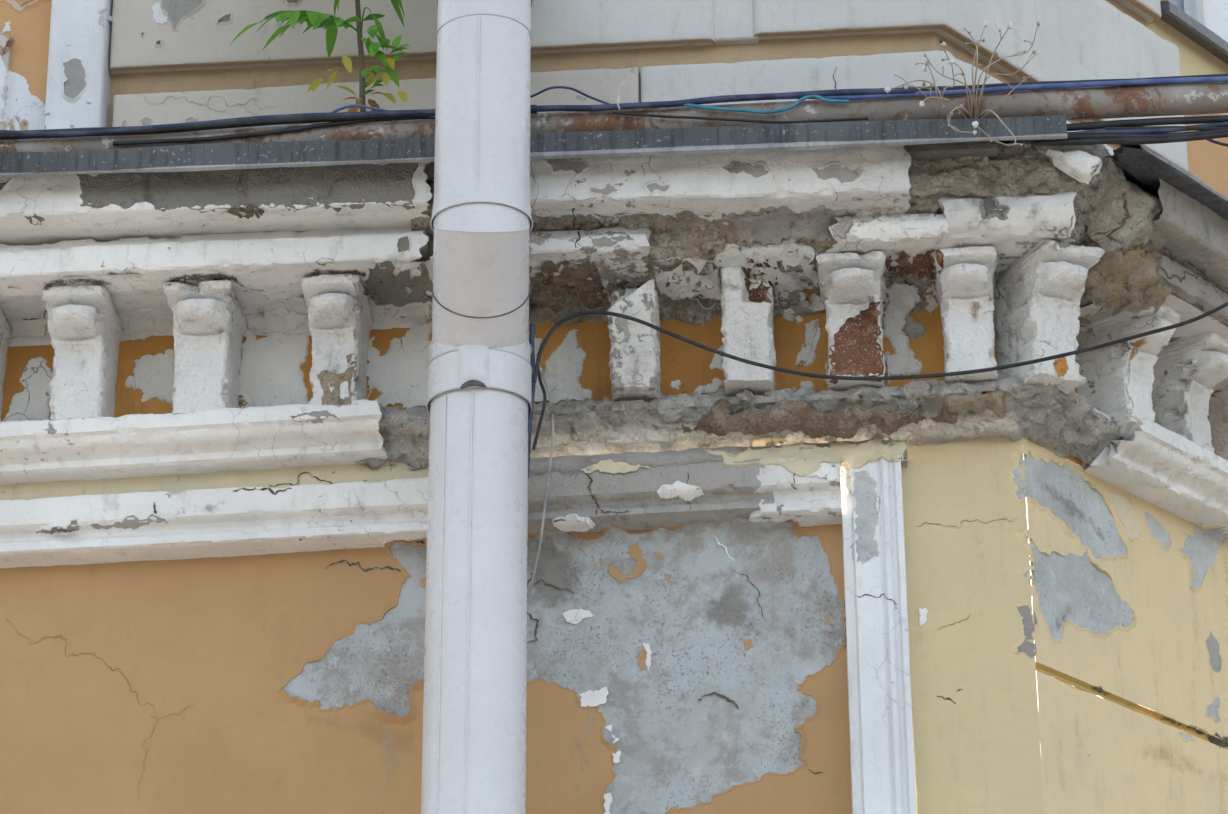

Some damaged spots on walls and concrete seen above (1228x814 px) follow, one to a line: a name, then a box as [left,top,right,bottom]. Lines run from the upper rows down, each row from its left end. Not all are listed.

peeling [0,0,52,131]
peeling [61,58,89,103]
peeling [539,158,591,175]
peeling [720,159,772,180]
spalling [884,142,1172,316]
peeling [73,163,434,471]
crack [6,619,190,794]
crack [233,472,333,495]
peeling [275,540,427,726]
crack [325,560,401,572]
peeling [526,514,847,814]
spalling [529,209,1228,661]